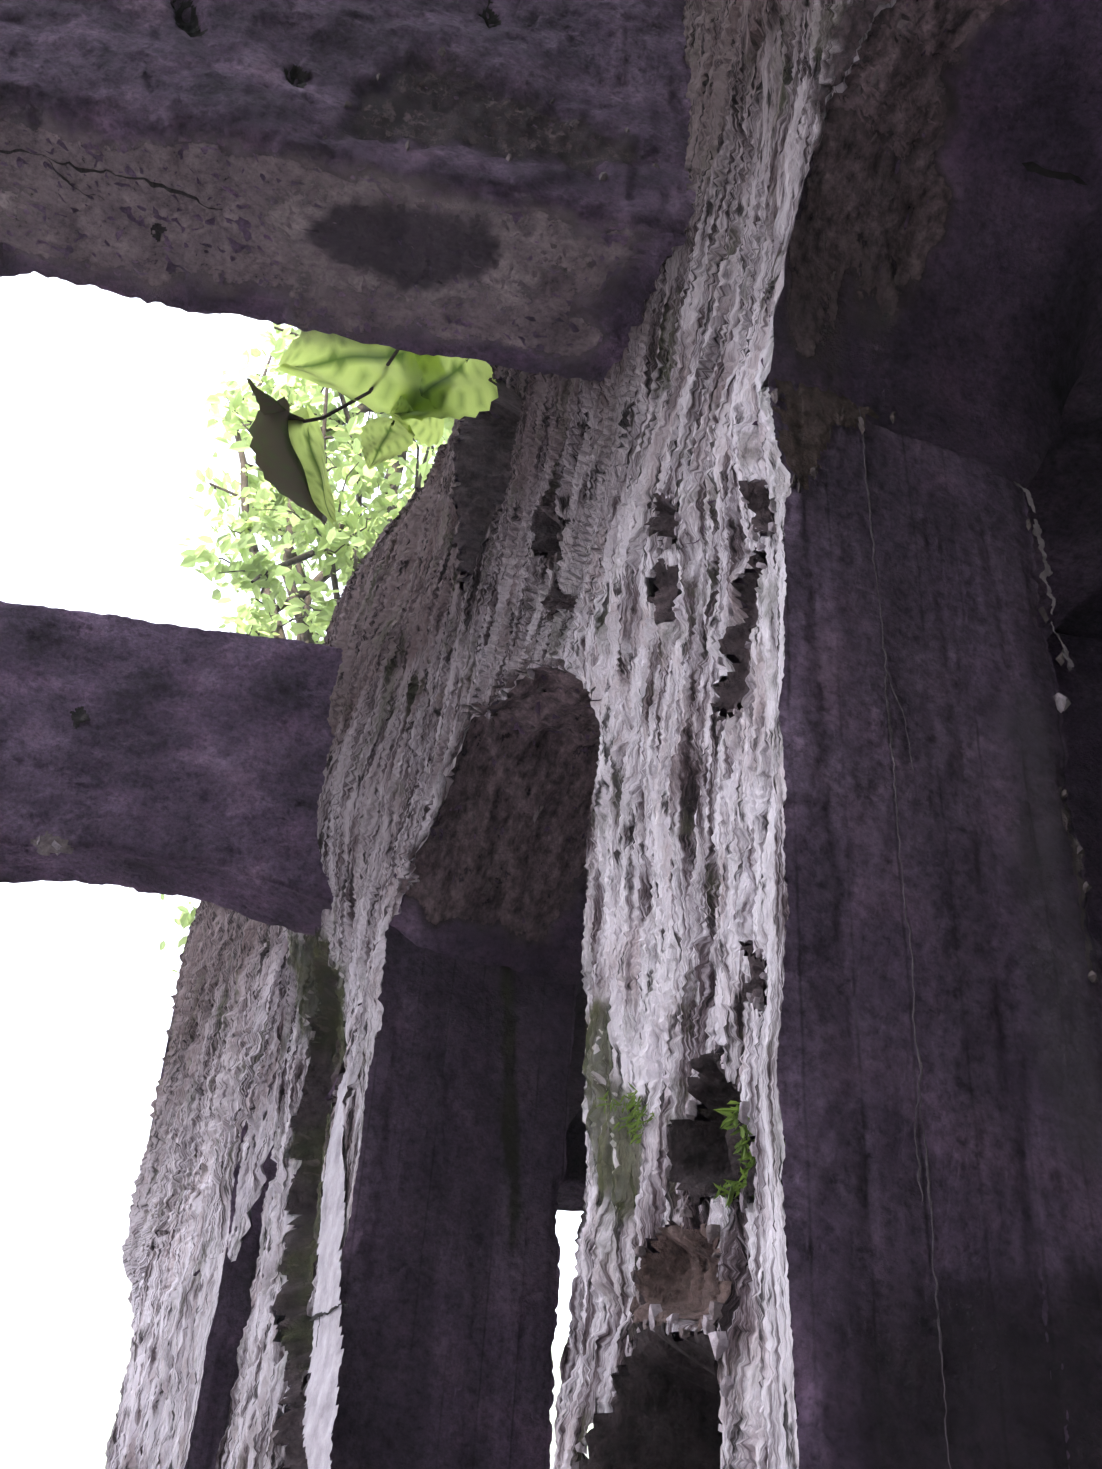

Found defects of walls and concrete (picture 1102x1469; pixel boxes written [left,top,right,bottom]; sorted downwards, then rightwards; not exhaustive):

spalling [170,0,208,37]
crack [0,149,223,210]
leakage [0,118,645,362]
peeling [713,1037,726,1069]
peeling [685,1100,697,1121]
peeling [721,1082,758,1213]
spalling [571,1126,740,1469]